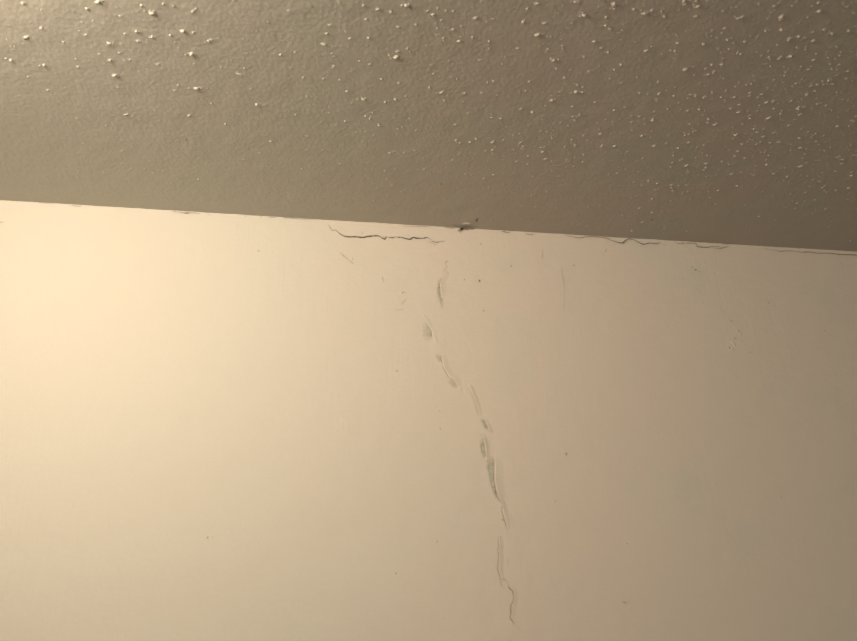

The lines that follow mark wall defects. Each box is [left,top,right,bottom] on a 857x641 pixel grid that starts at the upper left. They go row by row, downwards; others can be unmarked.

crack [329,224,438,243]
crack [569,235,659,245]
crack [422,269,519,626]